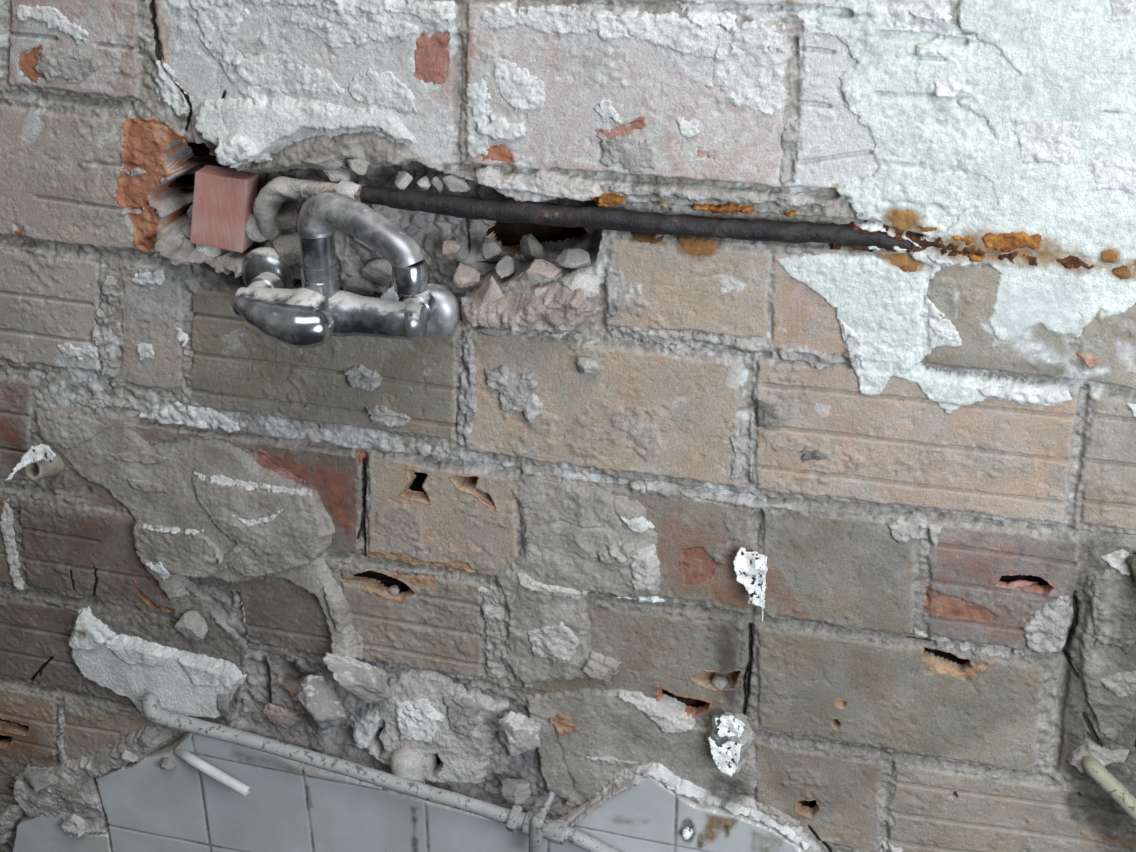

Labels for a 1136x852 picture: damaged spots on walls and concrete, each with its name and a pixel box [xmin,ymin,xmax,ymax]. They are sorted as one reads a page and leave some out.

crack [149,0,192,131]
peeling [115,94,604,253]
spalling [363,203,605,318]
peeling [775,0,1136,415]
corrosion [830,209,1136,279]
crack [357,458,367,556]
spalling [69,579,529,774]
peeling [618,669,754,777]
peeling [679,547,768,622]
crack [743,623,753,715]
crack [1062,591,1079,678]
crack [1084,714,1103,747]